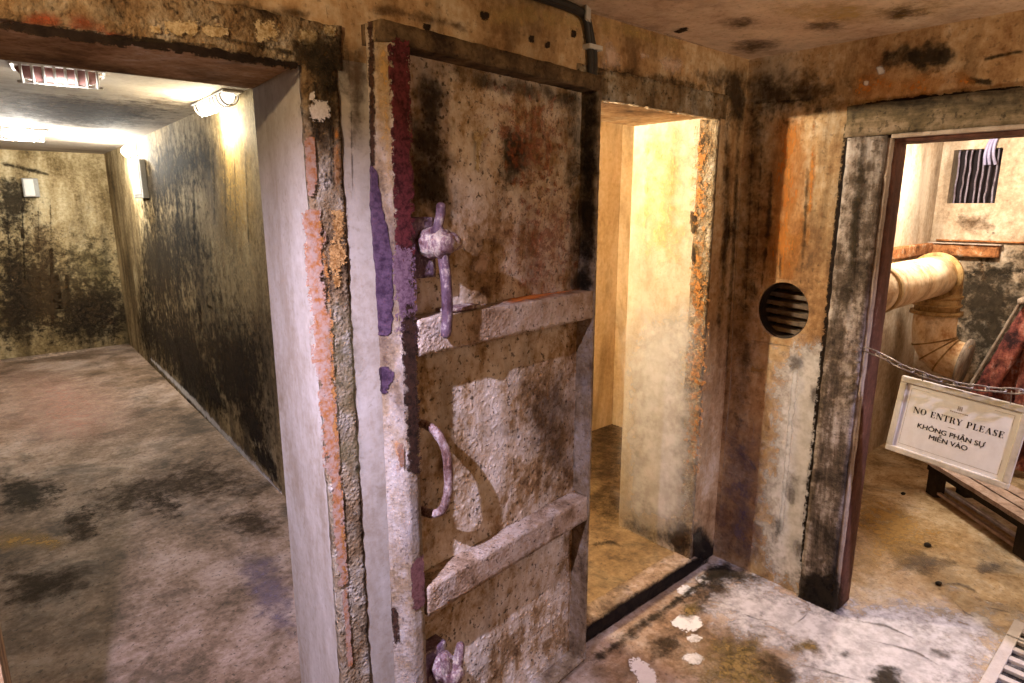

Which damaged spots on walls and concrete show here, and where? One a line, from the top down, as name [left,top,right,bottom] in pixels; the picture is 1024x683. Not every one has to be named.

water stain [0,562,92,605]
water stain [0,129,282,547]
peeling [309,91,330,122]
corrosion [318,221,347,603]
corrosion [475,79,581,302]
corrosion [684,126,710,479]
water stain [586,320,843,661]
water stain [703,71,834,358]
water stain [846,142,865,310]
water stain [890,9,921,18]
water stain [864,41,955,85]
water stain [964,262,1024,275]